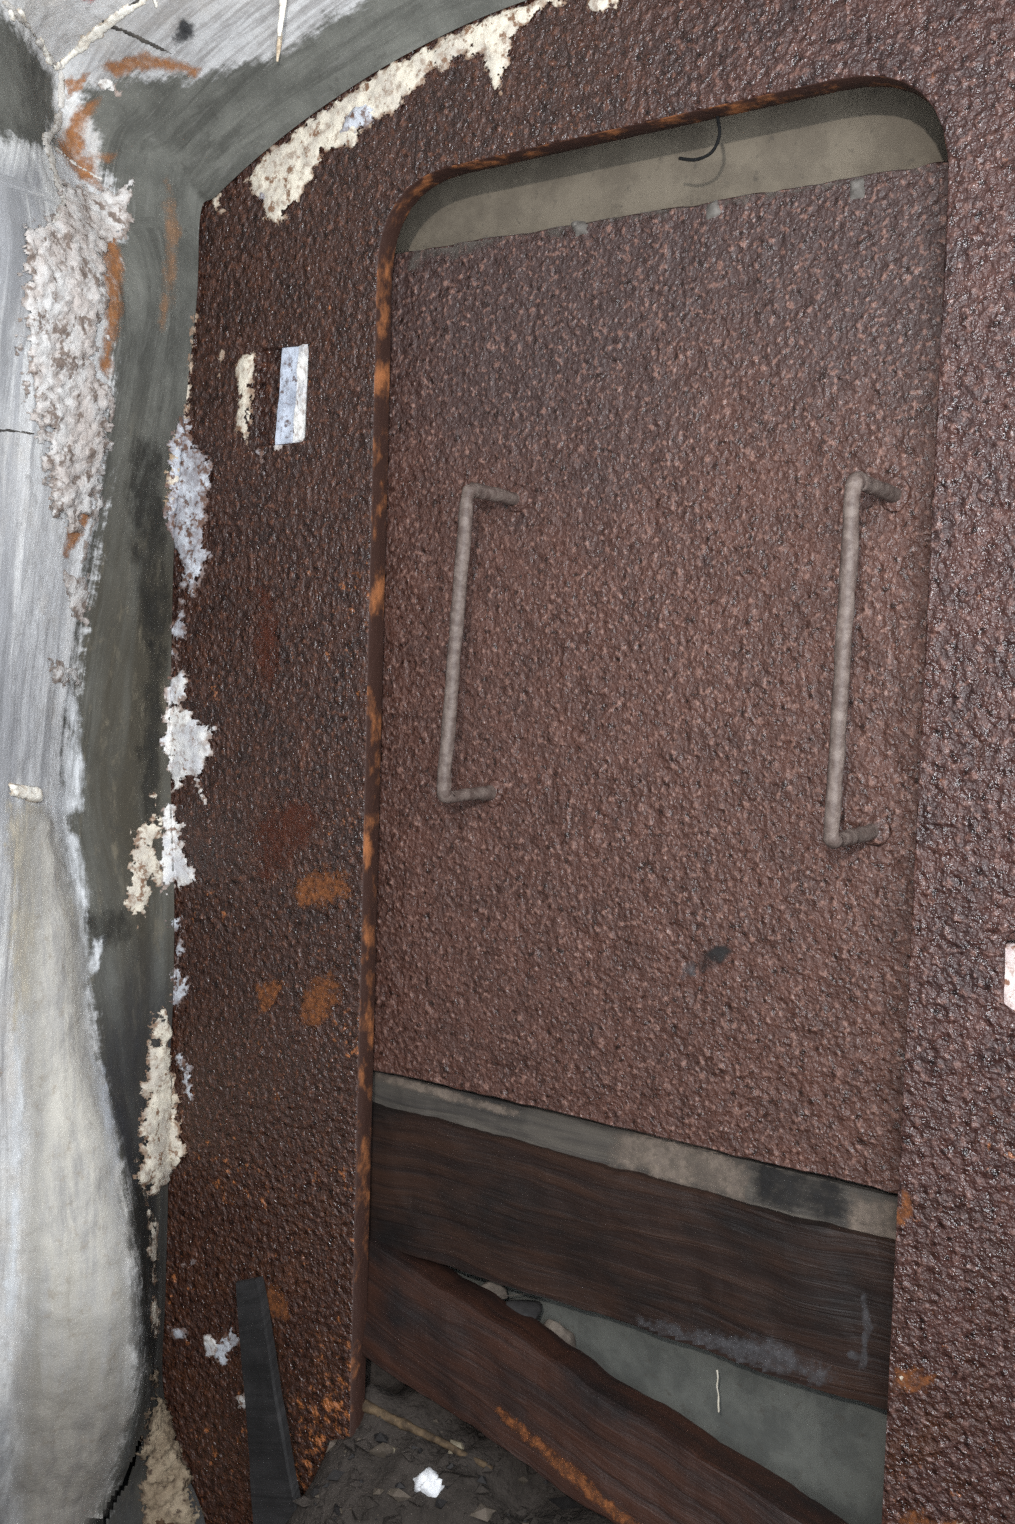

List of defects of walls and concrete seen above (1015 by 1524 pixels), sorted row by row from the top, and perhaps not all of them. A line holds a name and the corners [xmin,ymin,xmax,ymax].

efflorescence [276,0,287,62]
leakage [57,313,217,1007]
corrosion [296,871,350,906]
leakage [4,804,37,1167]
corrosion [300,972,340,1025]
leakage [90,1054,117,1196]
leakage [123,917,197,1359]
leakage [4,1186,19,1314]
corrosion [895,1367,935,1392]